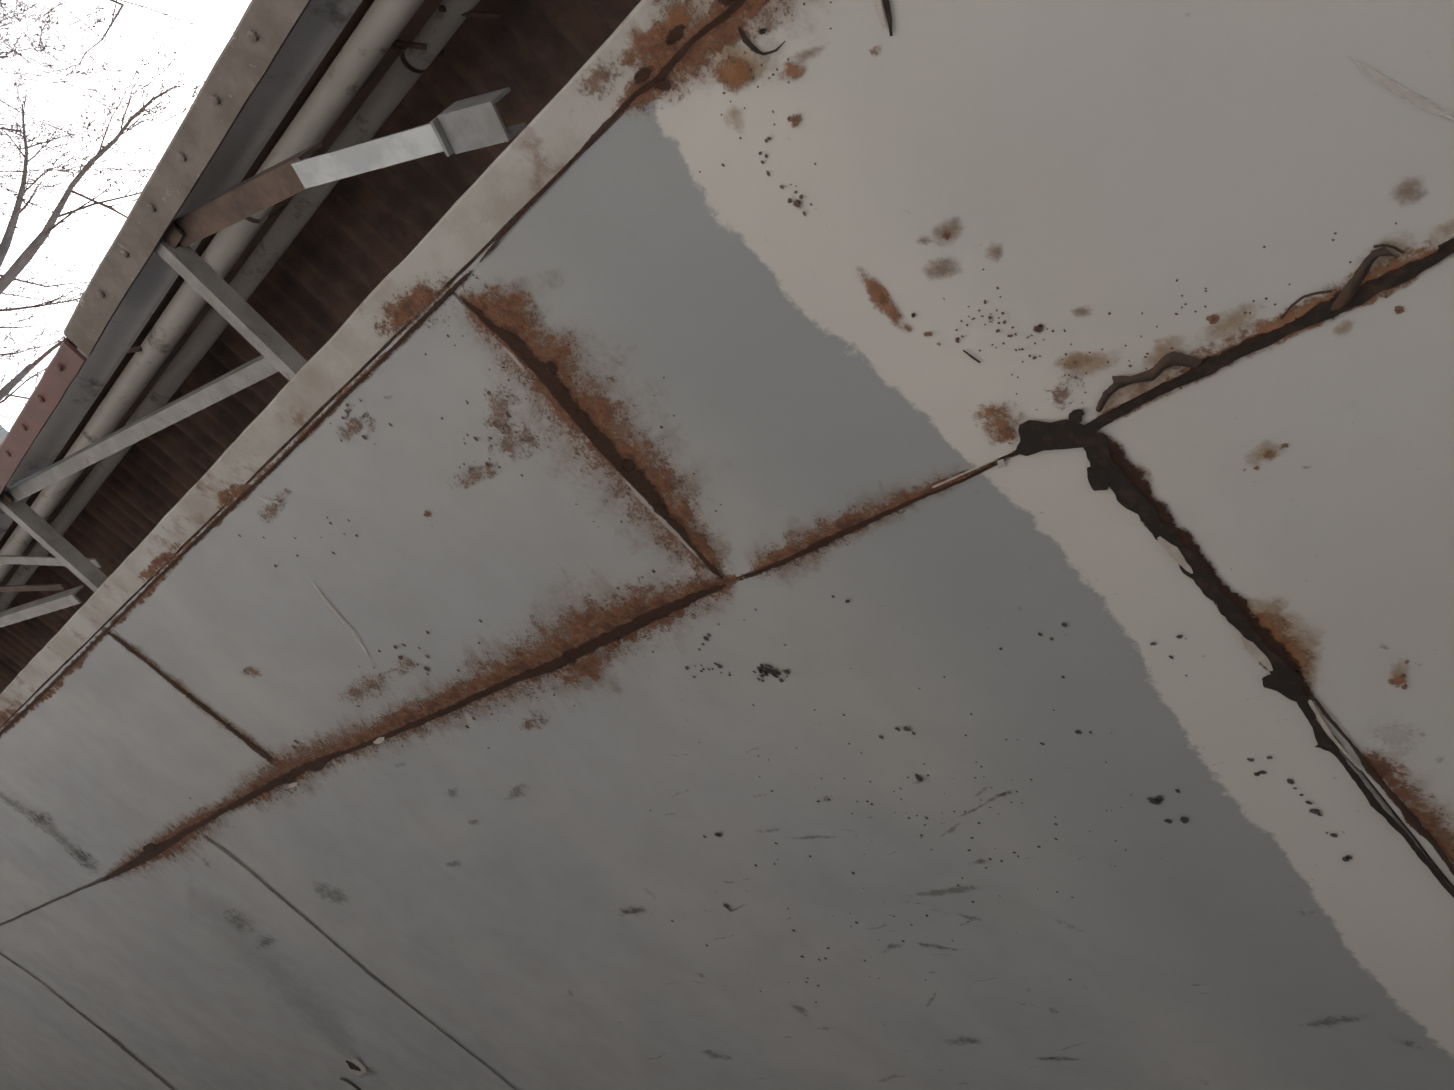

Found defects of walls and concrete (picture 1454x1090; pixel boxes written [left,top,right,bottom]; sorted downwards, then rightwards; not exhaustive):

corrosion [1098,226,1454,419]
corrosion [0,0,1109,882]
corrosion [1244,443,1288,471]
crack [1064,237,1454,898]
corrosion [1247,603,1316,679]
corrosion [1363,751,1454,865]